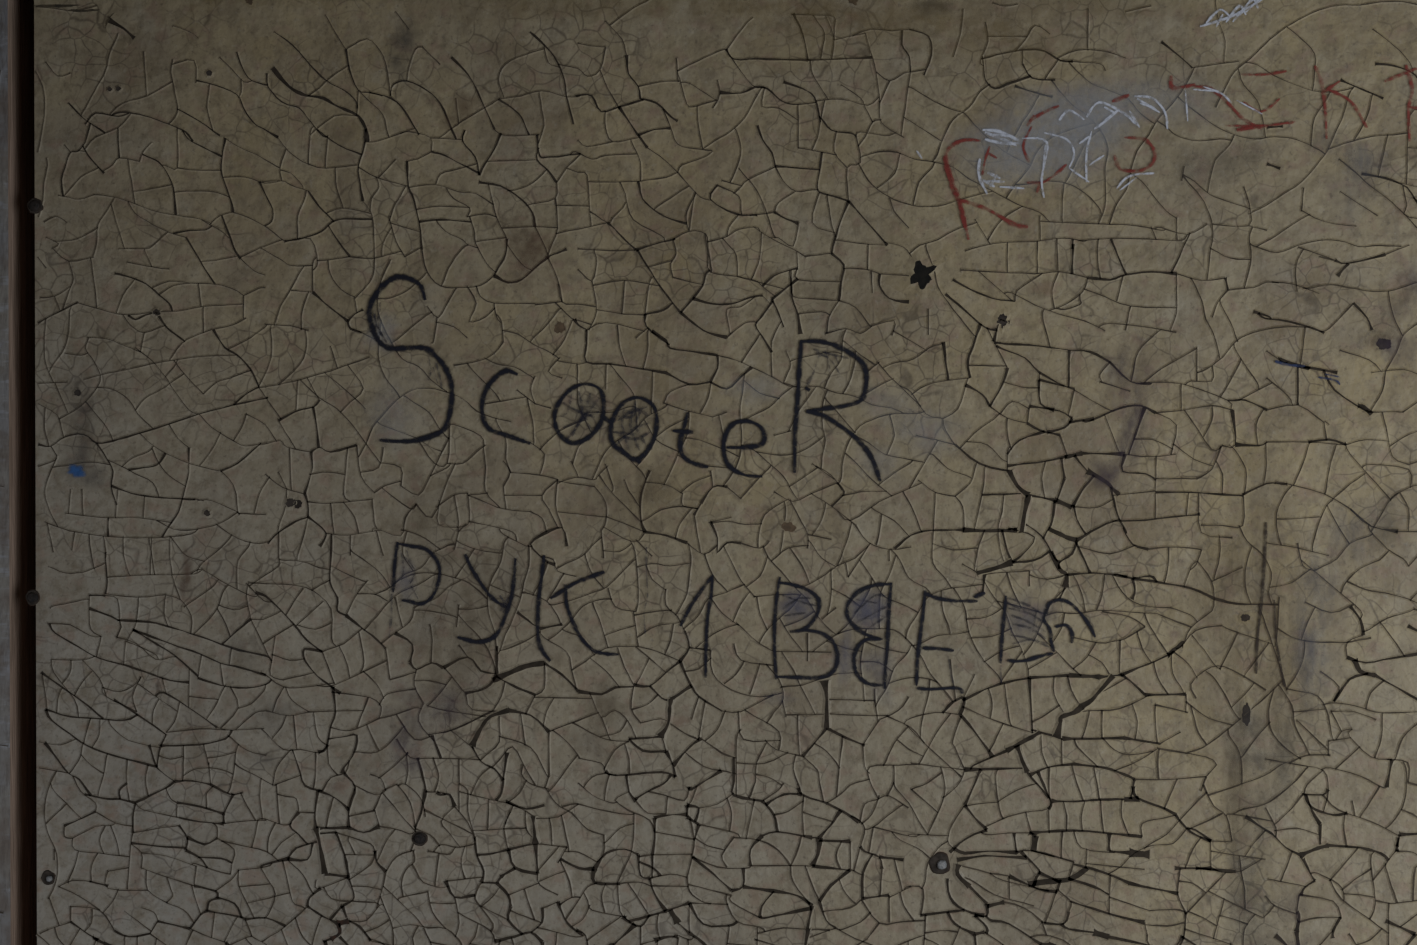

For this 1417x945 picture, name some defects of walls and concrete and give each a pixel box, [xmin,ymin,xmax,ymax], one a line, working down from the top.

crack [35,0,1126,945]
crack [469,0,1417,945]